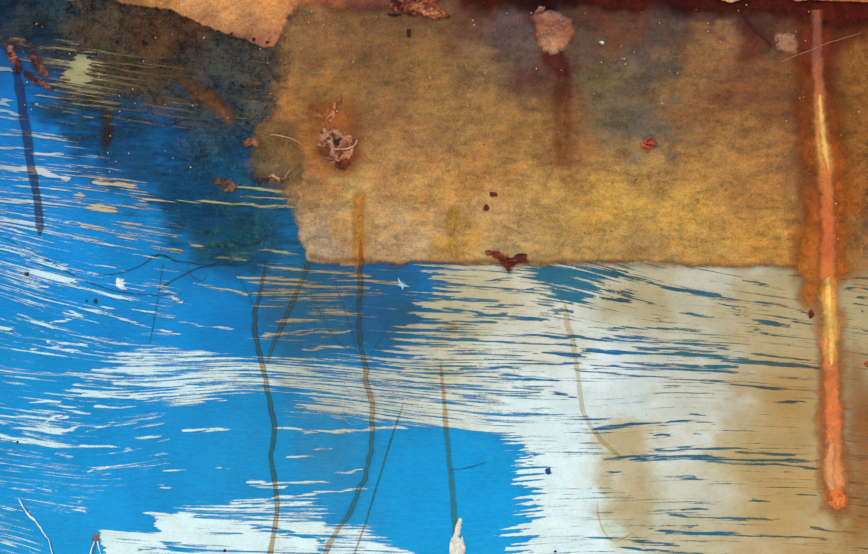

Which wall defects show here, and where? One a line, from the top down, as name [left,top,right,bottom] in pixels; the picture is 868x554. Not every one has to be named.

rust [6,36,52,89]
rust [242,0,868,518]